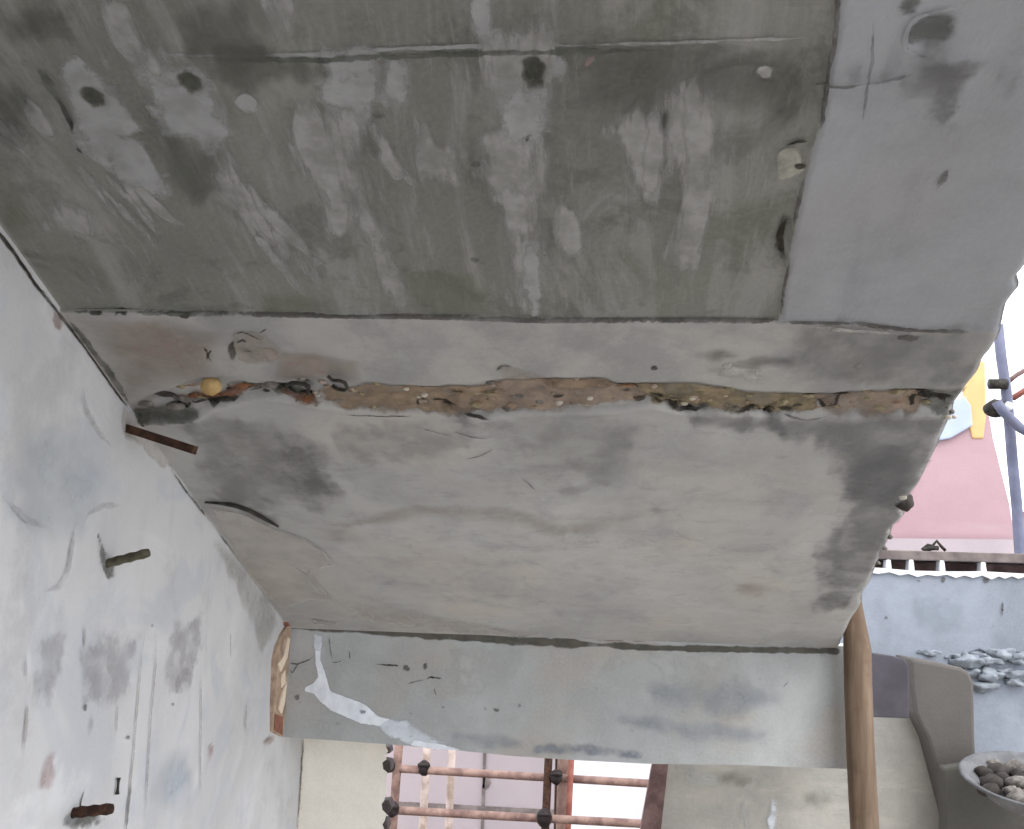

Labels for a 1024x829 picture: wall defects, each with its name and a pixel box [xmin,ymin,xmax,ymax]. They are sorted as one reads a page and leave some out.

leakage [41,199,92,239]
leakage [61,55,182,244]
leakage [102,0,321,289]
leakage [288,45,458,305]
leakage [470,0,566,317]
leakage [555,205,588,257]
leakage [602,72,715,271]
crack [794,183,804,219]
crack [817,41,906,123]
spalling [124,412,166,465]
spalling [908,388,955,414]
leakage [822,451,918,607]